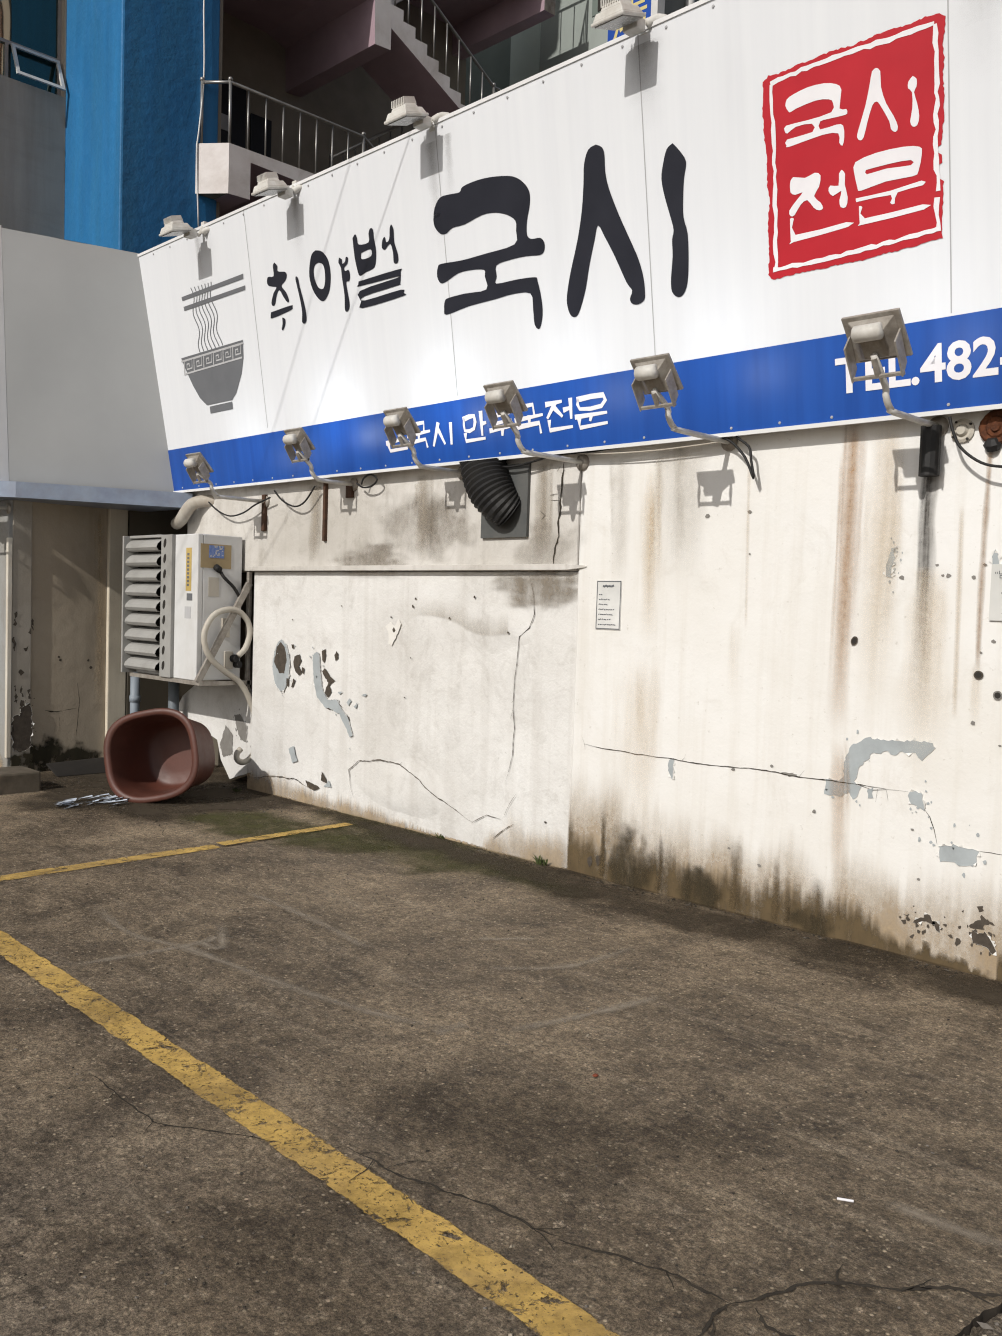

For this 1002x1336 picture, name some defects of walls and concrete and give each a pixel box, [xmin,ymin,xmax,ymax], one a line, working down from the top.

rust [843,439,855,617]
flaking render [11,669,36,753]
peeling [272,639,367,749]
crack [348,464,564,837]
crack [584,744,937,842]
peeling [824,730,935,806]
peeling [908,780,986,878]
water stain [0,753,1002,1006]
flaking render [899,906,997,956]